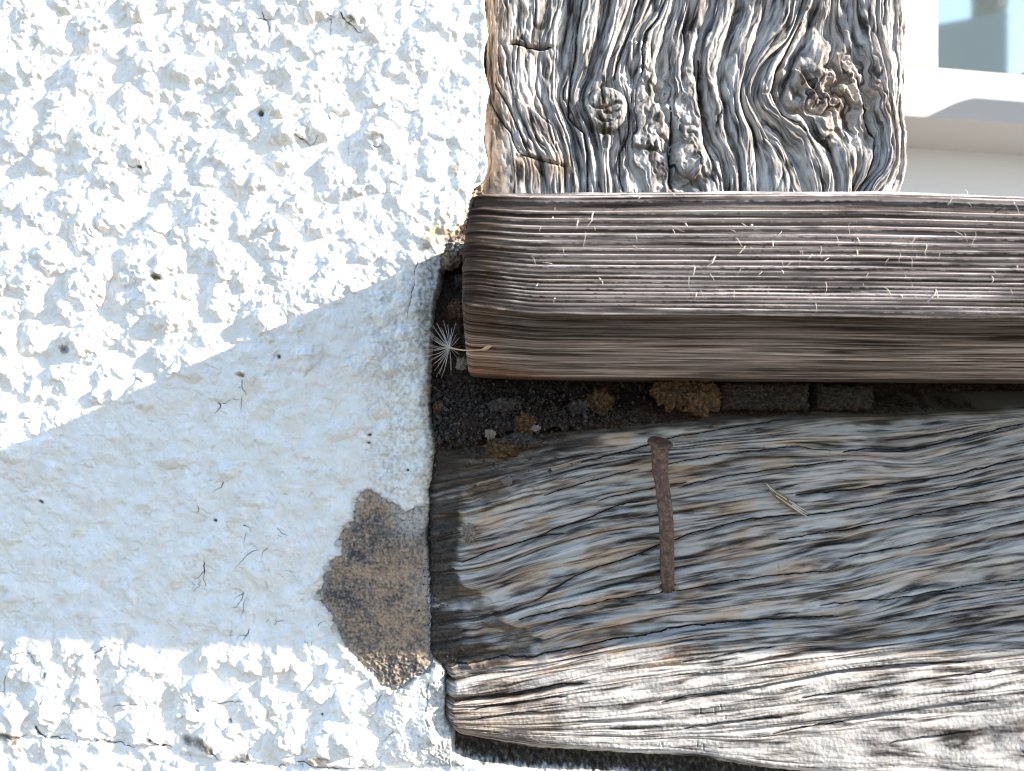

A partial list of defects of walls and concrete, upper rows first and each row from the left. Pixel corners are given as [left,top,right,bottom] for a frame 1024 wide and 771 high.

spalling [313,490,433,691]